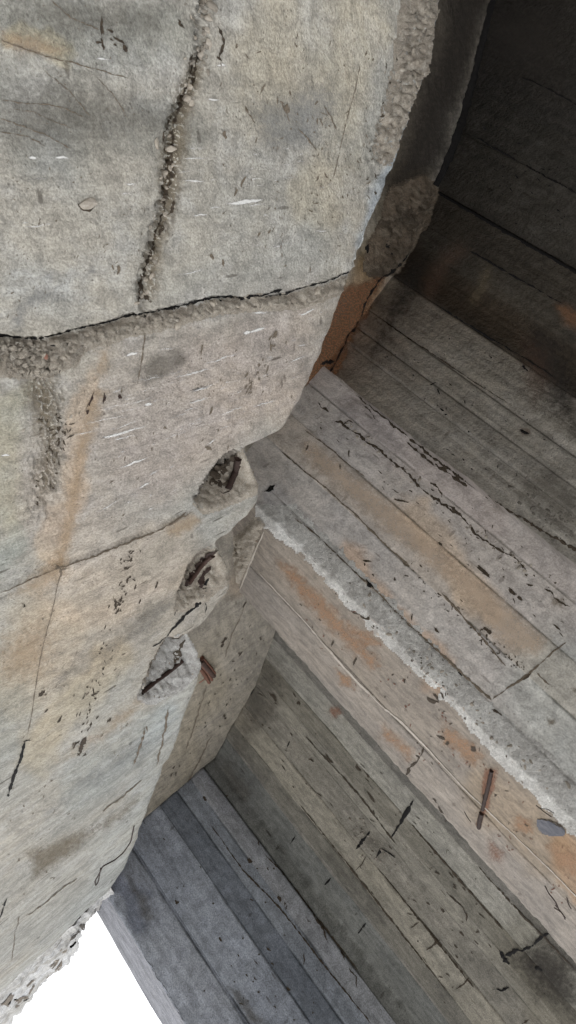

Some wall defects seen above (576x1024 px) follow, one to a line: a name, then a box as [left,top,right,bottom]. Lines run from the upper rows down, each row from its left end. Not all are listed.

crack [0,0,349,373]
rust [306,278,383,385]
spalling [0,276,347,510]
crack [318,396,576,607]
spalling [137,634,201,705]
spalling [174,548,229,613]
rust [199,656,216,684]
spalling [193,429,576,837]
crack [7,740,34,797]
crack [356,801,413,870]
spalling [0,888,114,1024]
crack [493,933,549,992]